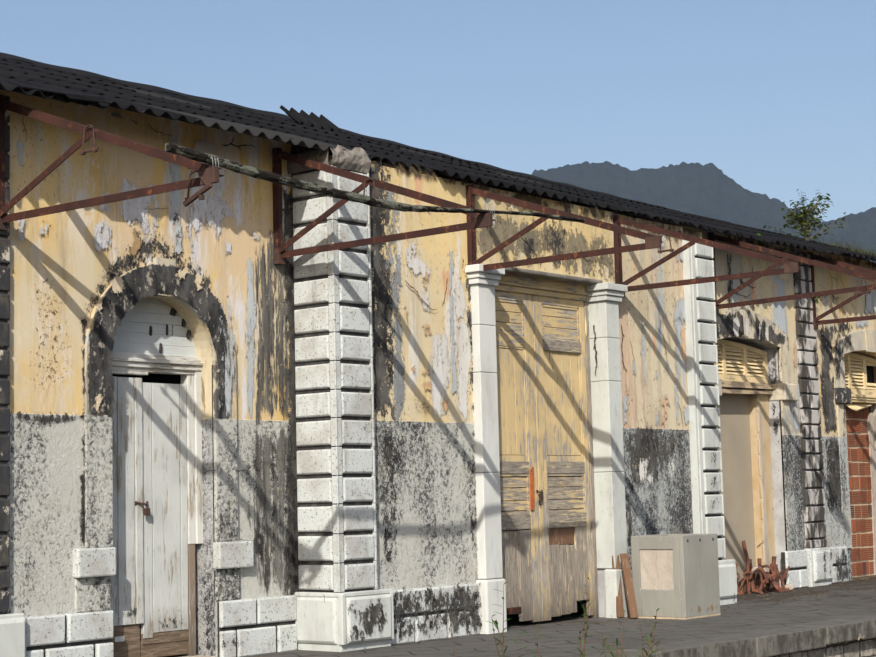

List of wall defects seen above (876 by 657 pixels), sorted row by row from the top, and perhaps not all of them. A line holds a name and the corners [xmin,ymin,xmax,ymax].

peeling [92,178,160,256]
peeling [170,163,233,257]
water stain [476,191,646,279]
water stain [16,213,228,545]
water stain [247,187,300,595]
water stain [369,161,500,568]
peeling [405,238,472,424]
peeling [623,297,690,427]
water stain [818,316,853,515]
mould [623,422,680,546]
mould [198,577,242,655]